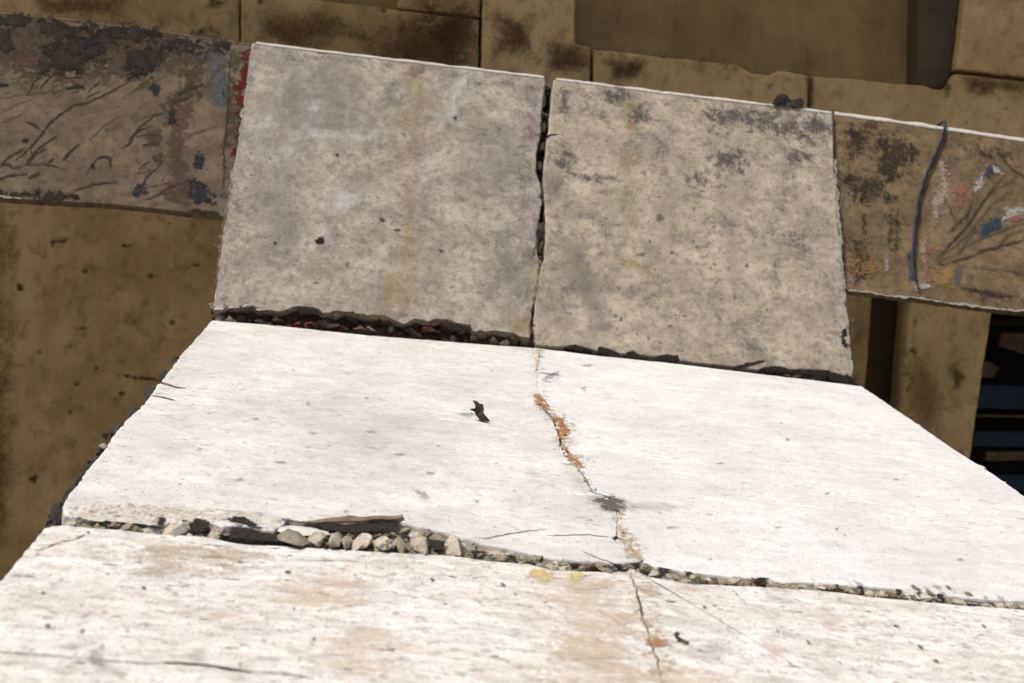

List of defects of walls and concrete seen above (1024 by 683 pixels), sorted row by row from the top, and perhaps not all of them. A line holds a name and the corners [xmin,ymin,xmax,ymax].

damp [0,0,238,79]
damp [266,16,335,60]
damp [387,5,480,119]
damp [603,61,652,128]
spalling [141,28,1024,348]
damp [684,79,921,285]
spalling [755,159,1024,386]
crack [0,86,678,683]
spalling [564,344,681,364]
rust [534,394,585,468]
peeling [277,525,331,536]
peeling [911,584,1004,599]